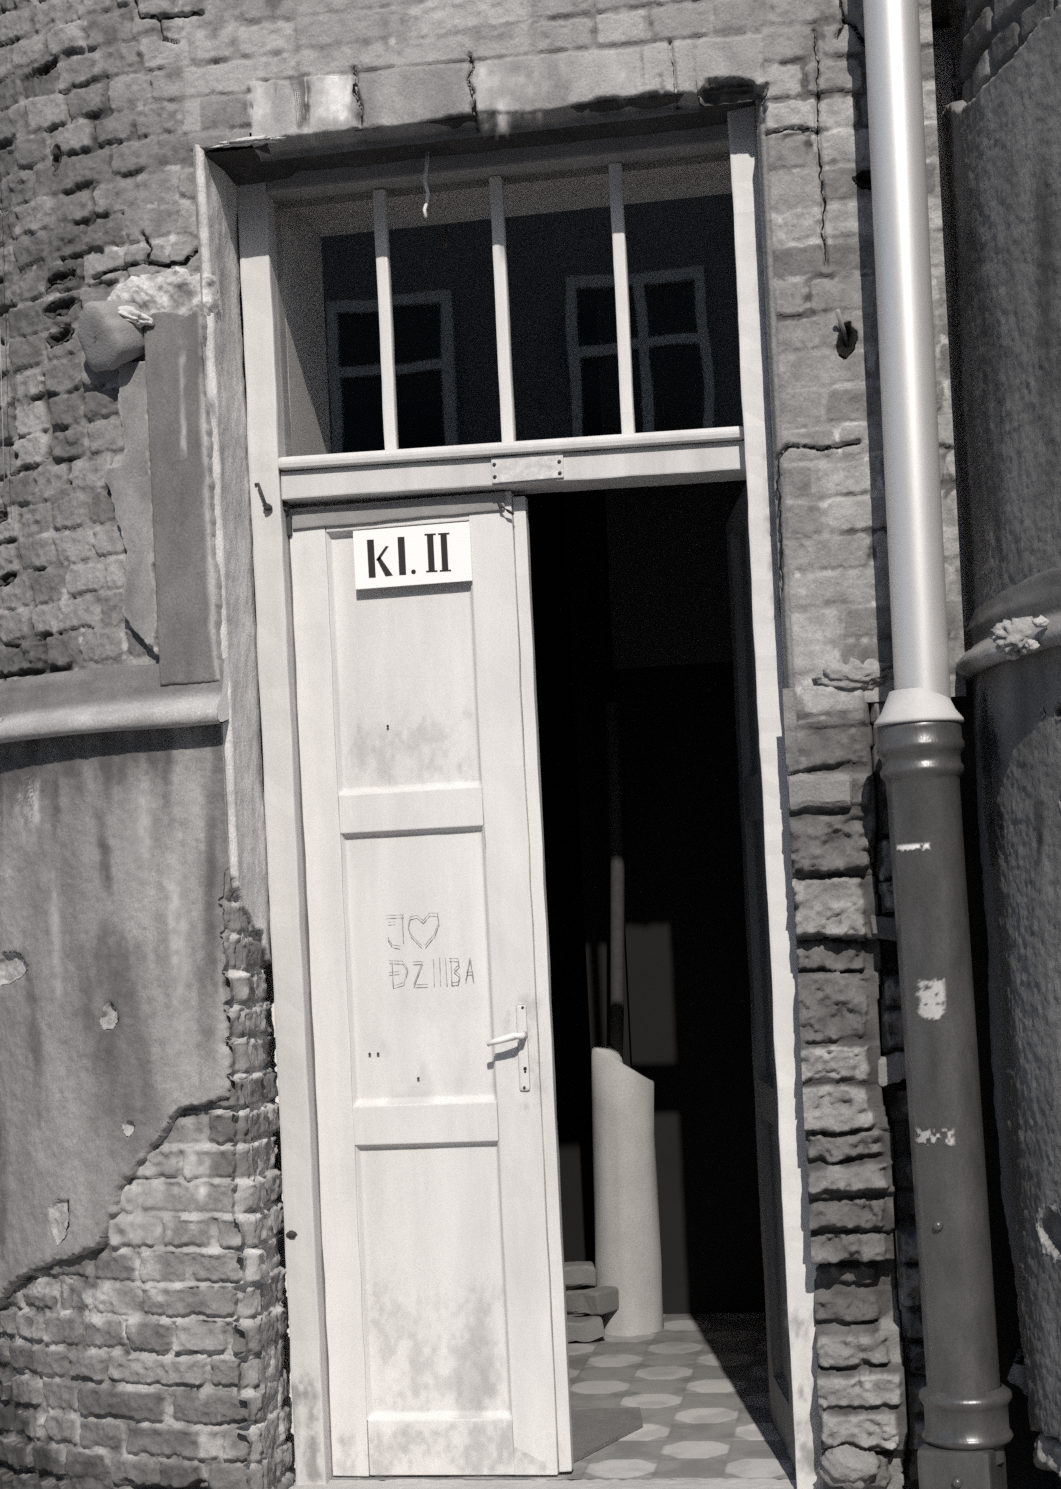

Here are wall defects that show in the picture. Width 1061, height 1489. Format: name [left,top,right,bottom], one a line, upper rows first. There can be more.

crack [135,0,202,44]
crack [352,70,364,126]
crack [467,57,477,121]
crack [769,0,865,265]
spalling [837,323,857,358]
leakage [0,740,40,825]
leakage [101,788,154,877]
leakage [49,888,62,998]
leakage [166,877,190,1035]
spalling [782,686,927,1489]
spalling [951,681,1061,1489]
flaking render [0,1070,268,1489]